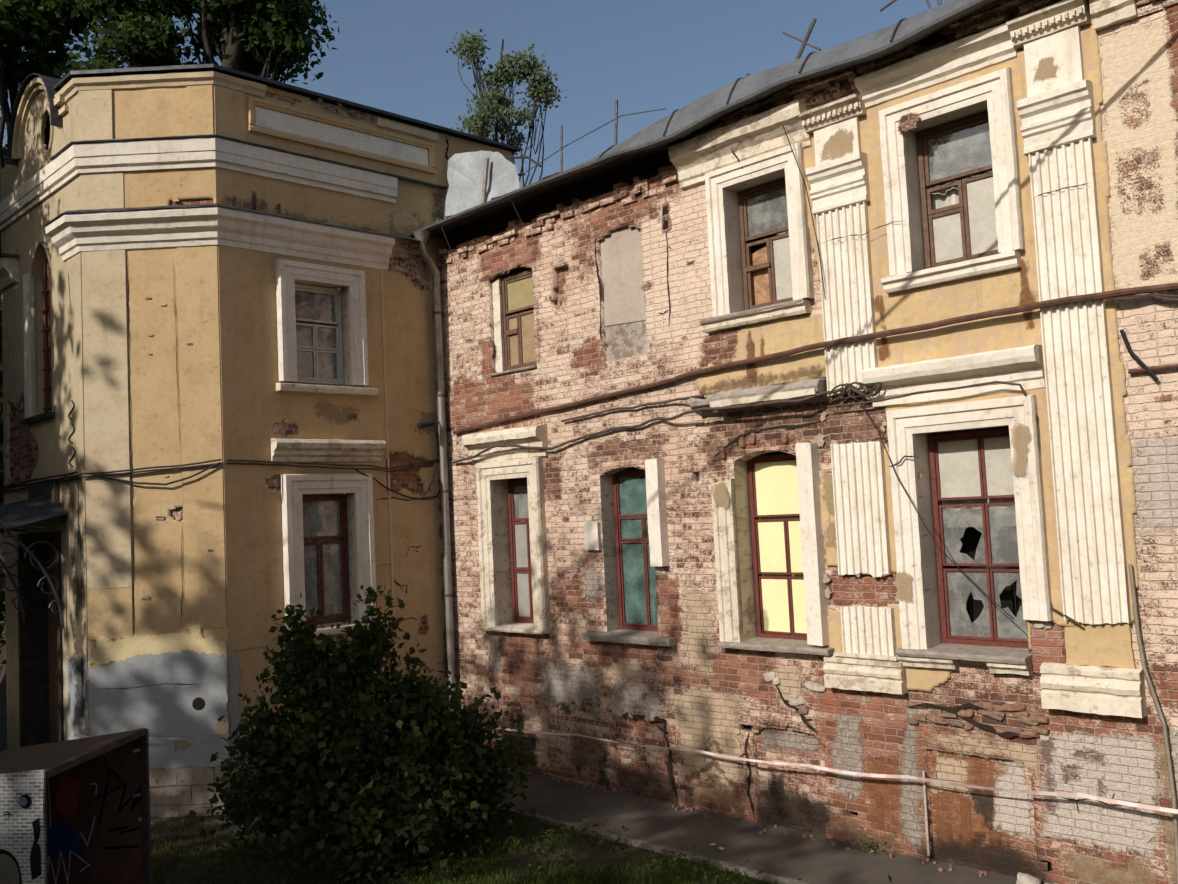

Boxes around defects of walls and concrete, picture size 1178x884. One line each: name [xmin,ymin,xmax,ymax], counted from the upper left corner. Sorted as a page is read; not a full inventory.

flaking render [1166,4,1178,121]
crack [659,232,672,321]
spalling [9,398,38,487]
peeling [88,623,227,665]
flaking render [657,579,678,632]
spalling [1027,620,1066,675]
crack [740,732,756,820]
water stain [762,772,828,831]
crack [775,685,817,733]
peeling [574,639,1178,858]